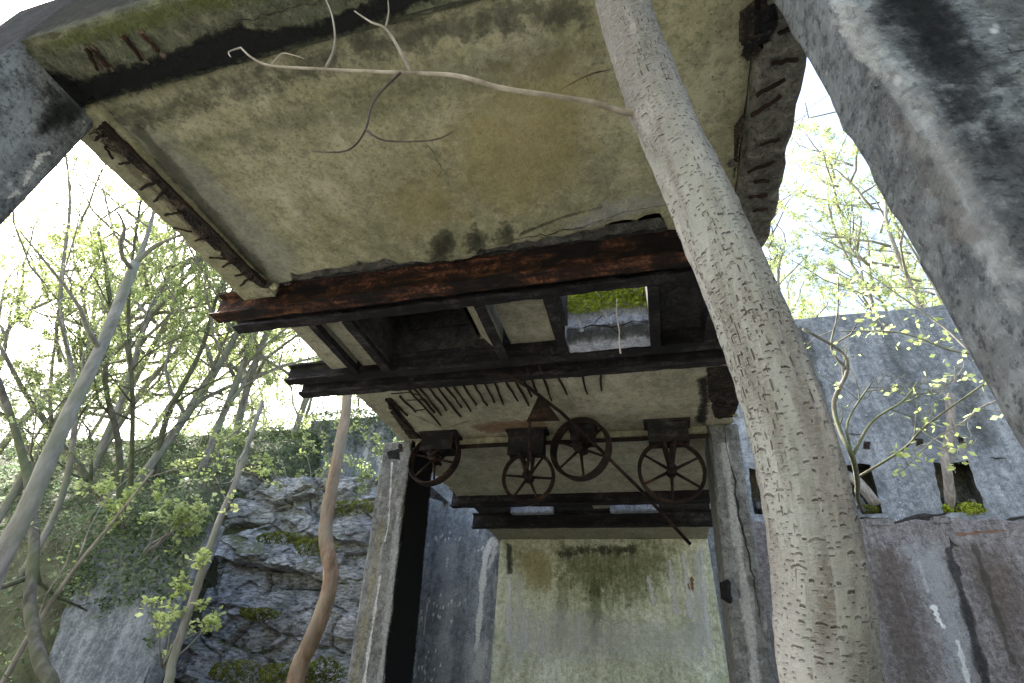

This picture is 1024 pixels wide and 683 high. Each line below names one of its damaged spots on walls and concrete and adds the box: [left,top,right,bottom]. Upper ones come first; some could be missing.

damp [38,0,587,133]
spalling [739,0,799,66]
damp [874,0,994,118]
spalling [727,78,786,213]
spalling [89,121,278,290]
spalling [385,365,568,460]
damp [560,544,713,650]